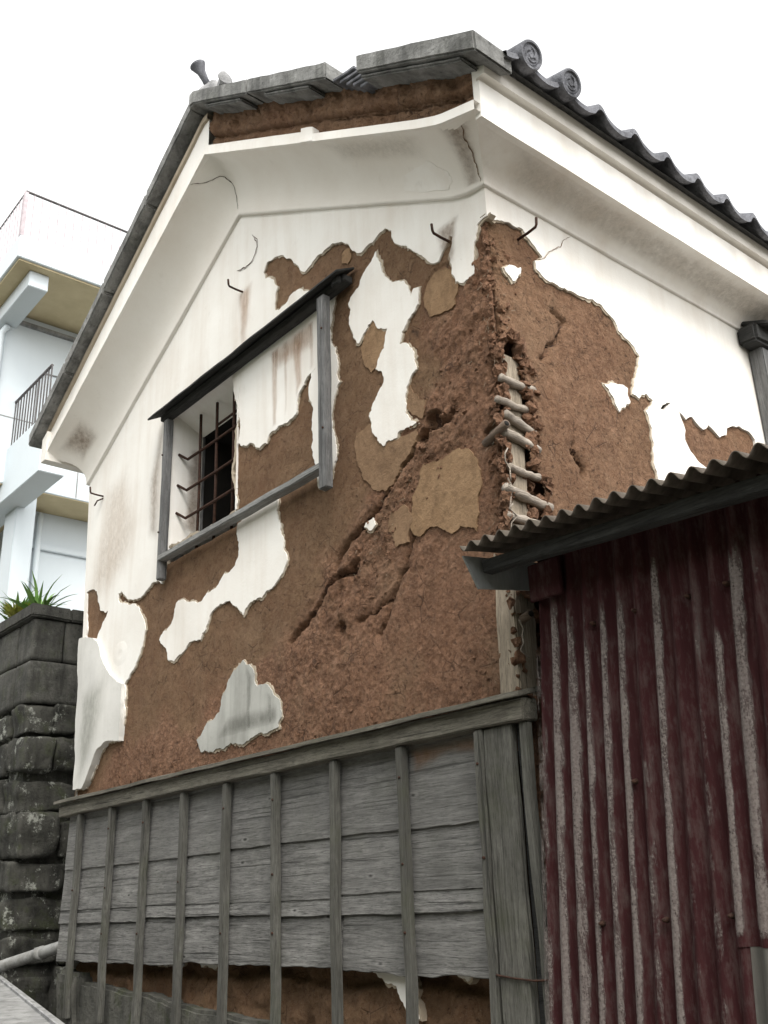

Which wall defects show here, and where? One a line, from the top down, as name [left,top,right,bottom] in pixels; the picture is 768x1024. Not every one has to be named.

spalling [76,962,491,1024]
crack [308,572,358,626]
spalling [74,221,655,801]
crack [355,490,391,540]
peeling [522,601,649,1024]
peeling [649,561,686,1024]
spalling [680,416,753,467]
peeling [715,547,768,937]